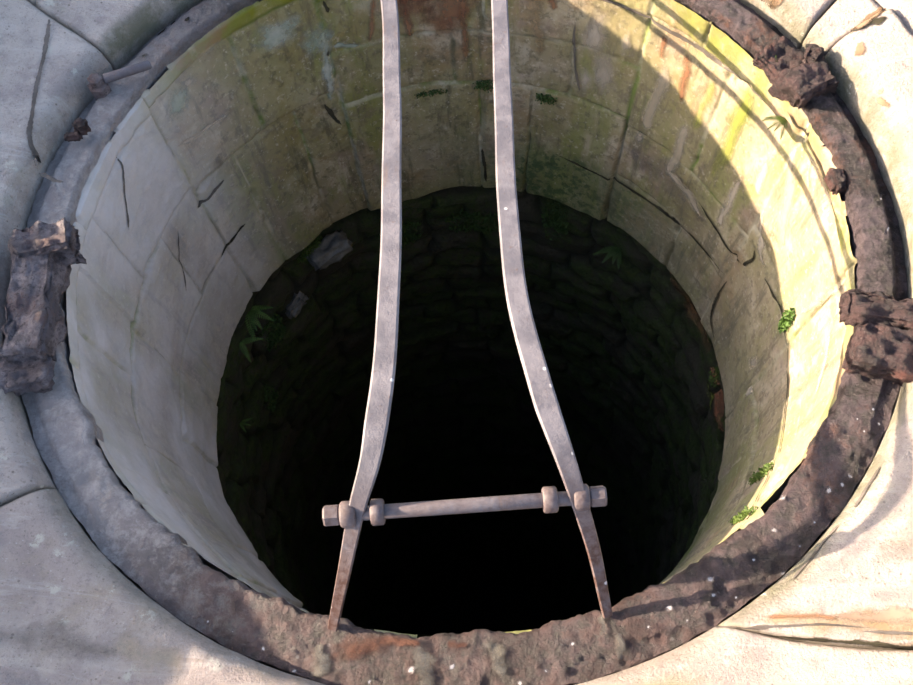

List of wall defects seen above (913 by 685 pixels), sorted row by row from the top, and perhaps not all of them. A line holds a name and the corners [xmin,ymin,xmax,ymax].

rust [397,0,475,57]
rust [679,56,690,100]
damp [713,91,751,171]
crack [480,150,488,181]
crack [560,156,755,337]
crack [765,280,783,317]